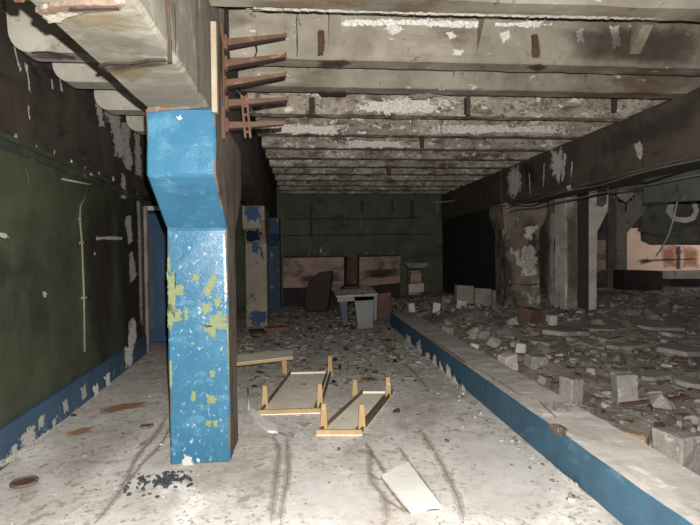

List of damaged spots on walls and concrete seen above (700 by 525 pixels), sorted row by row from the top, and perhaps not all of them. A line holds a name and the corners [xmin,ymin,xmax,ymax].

rust [220,28,229,96]
rust [317,30,350,68]
peeling [249,7,666,44]
rust [527,34,546,71]
spalling [309,91,347,114]
peeling [348,89,466,117]
peeling [95,100,142,199]
peeling [260,123,569,149]
peeling [519,226,539,276]
peeling [124,194,143,372]
peeling [167,255,188,332]
peeling [192,234,229,375]